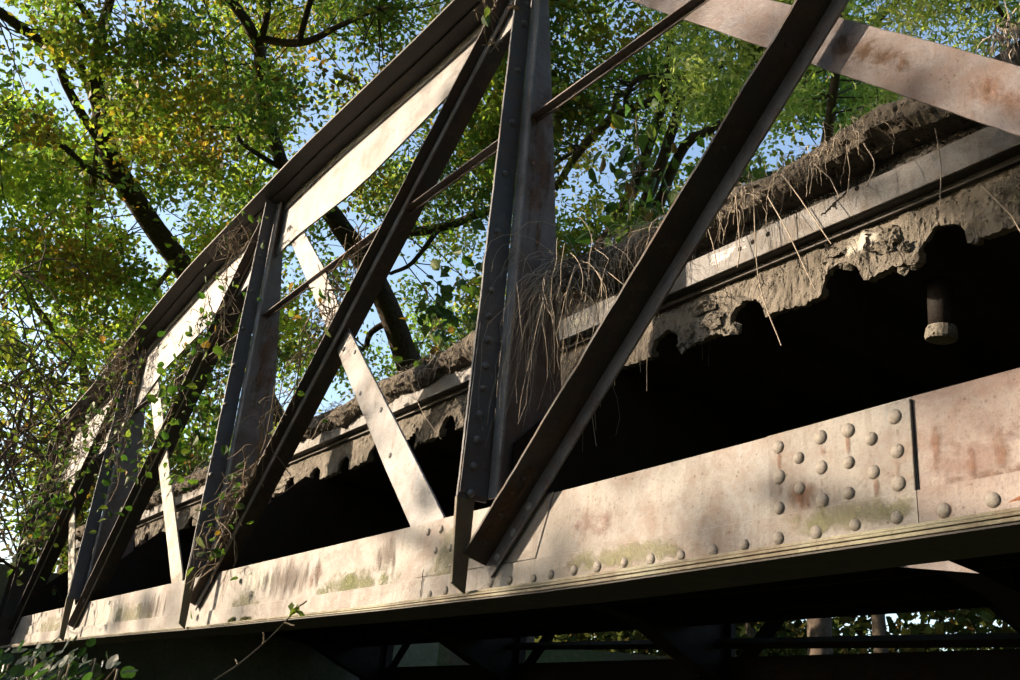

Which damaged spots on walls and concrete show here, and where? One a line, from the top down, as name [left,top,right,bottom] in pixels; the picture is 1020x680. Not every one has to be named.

rust [833,38,905,70]
peeling [708,240,747,266]
spalling [818,245,856,271]
spalling [897,240,922,276]
spalling [676,311,742,354]